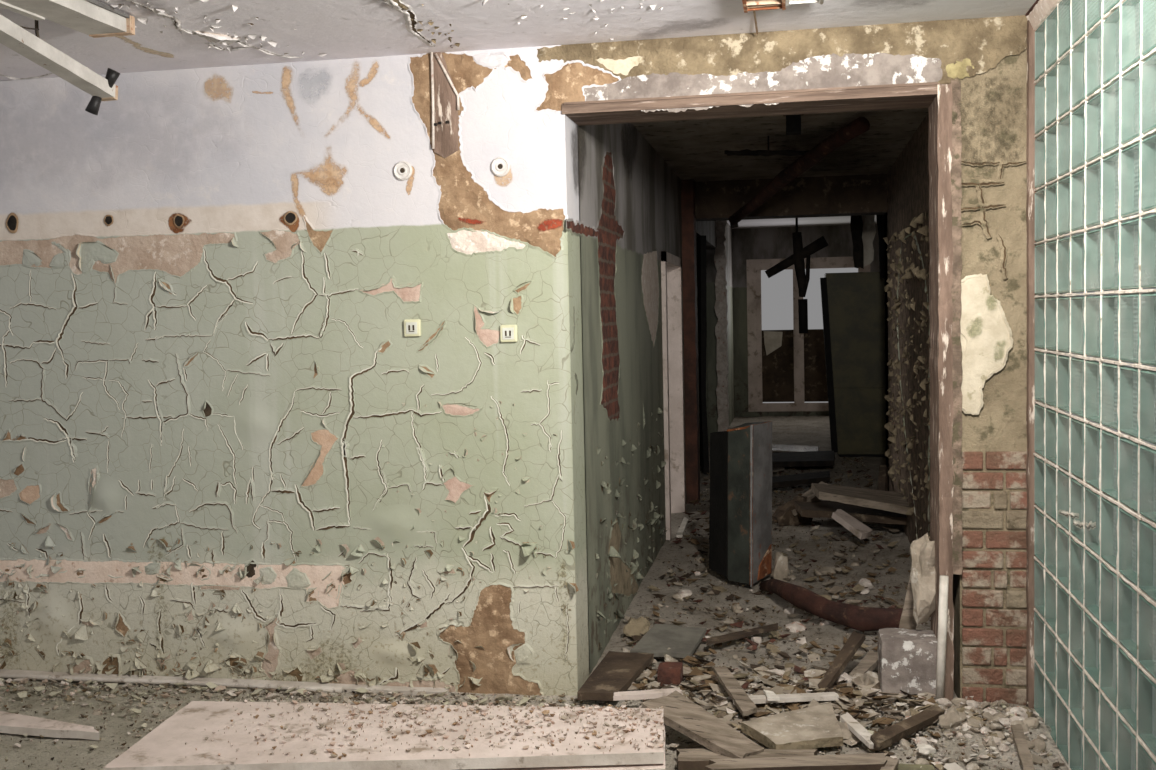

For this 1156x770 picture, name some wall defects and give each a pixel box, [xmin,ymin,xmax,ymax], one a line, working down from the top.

crack [383,0,435,47]
peeling [0,231,239,296]
peeling [259,215,334,265]
spalling [407,15,1028,423]
crack [0,241,578,660]
peeling [1,428,74,542]
peeling [85,465,116,526]
peeling [0,557,357,610]
spalling [259,582,544,696]
crack [375,666,451,685]